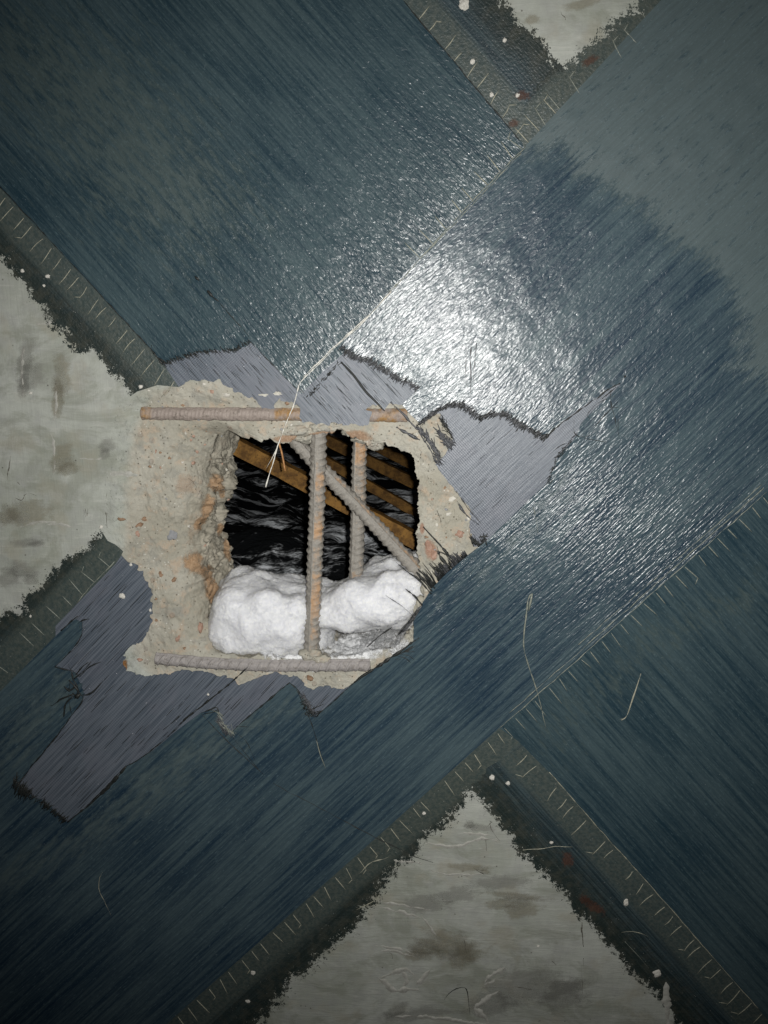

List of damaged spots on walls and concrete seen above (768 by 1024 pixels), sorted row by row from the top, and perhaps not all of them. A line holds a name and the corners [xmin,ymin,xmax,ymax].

corrosion [184,554,219,603]
corrosion [194,475,231,561]
spalling [10,276,626,824]